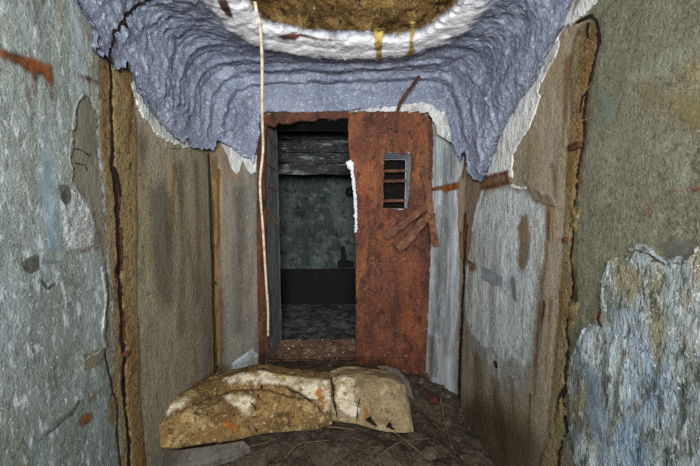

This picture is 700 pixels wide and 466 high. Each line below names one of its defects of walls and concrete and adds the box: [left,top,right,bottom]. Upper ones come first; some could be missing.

rust [0,49,52,83]
peeling [131,81,191,151]
peeling [354,101,451,143]
peeling [221,142,257,174]
rust [432,182,459,193]
rust [481,171,510,193]
crack [570,14,602,304]
peeling [59,94,115,371]
crack [104,0,150,466]
peeling [566,244,700,466]
crack [557,319,574,466]